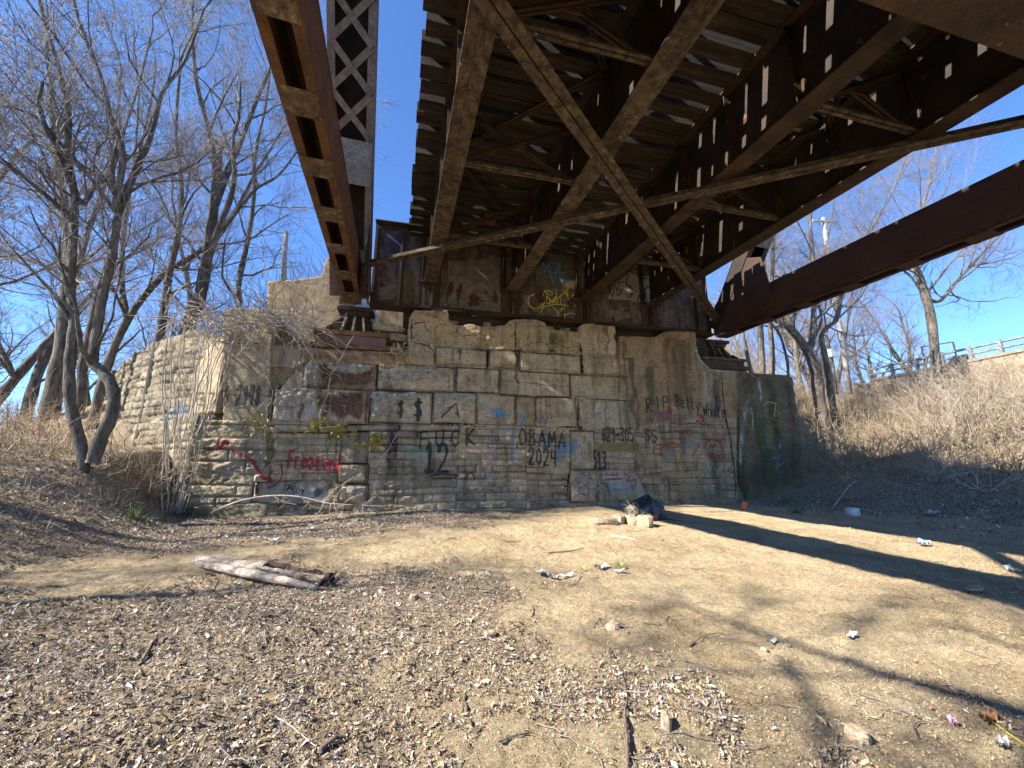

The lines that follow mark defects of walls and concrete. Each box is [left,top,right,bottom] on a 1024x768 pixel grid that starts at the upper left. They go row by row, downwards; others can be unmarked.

crack [410,310,584,386]